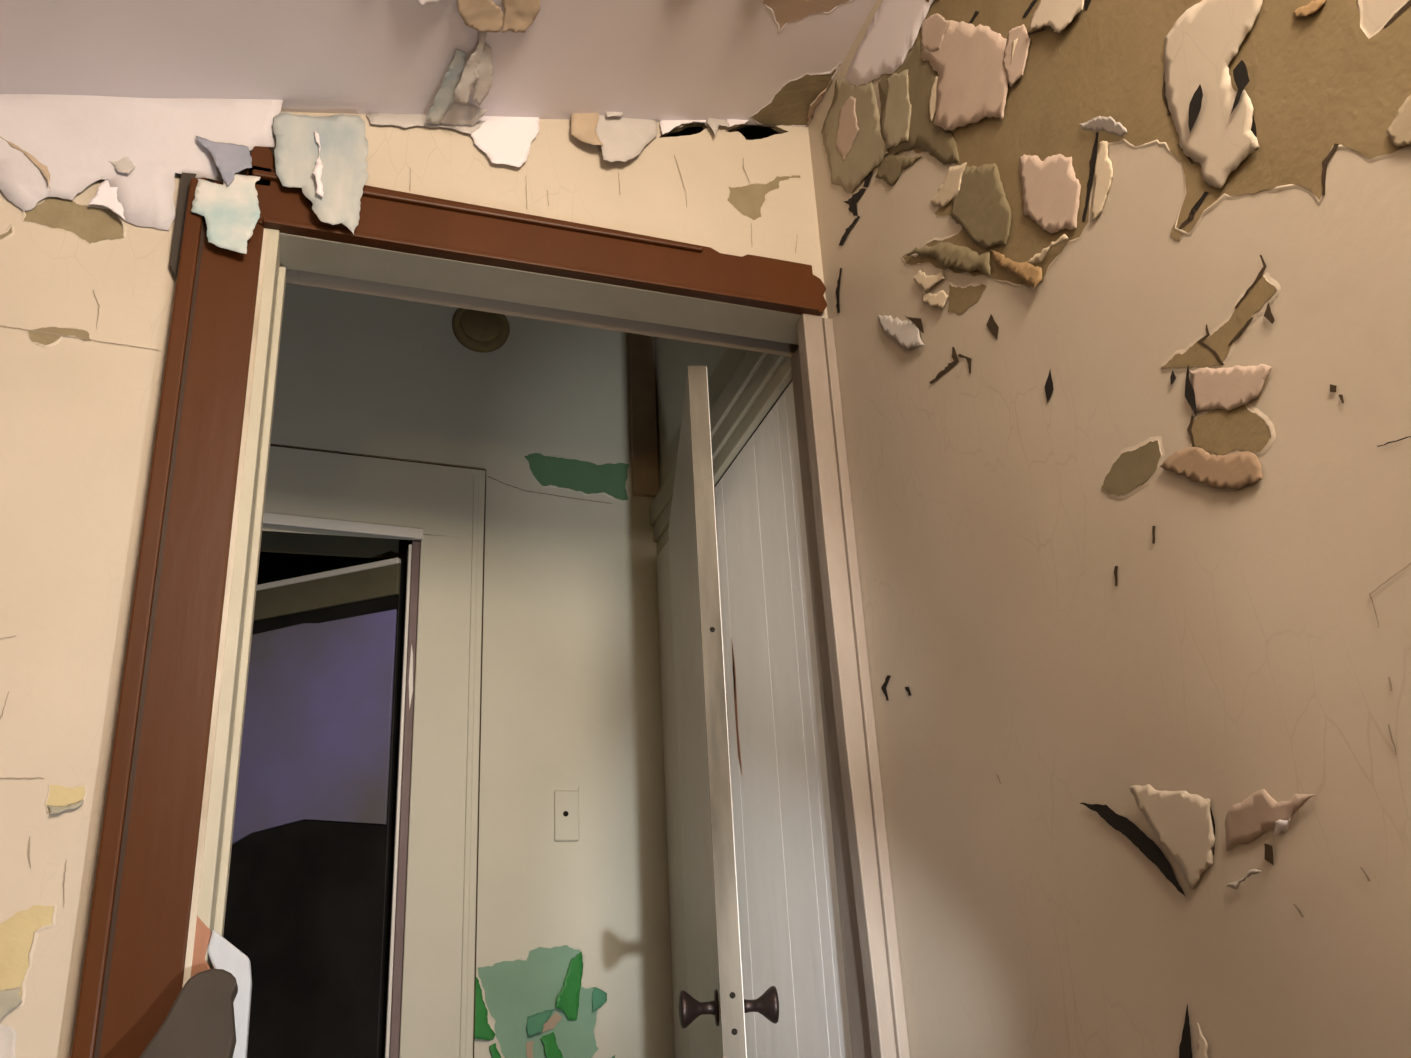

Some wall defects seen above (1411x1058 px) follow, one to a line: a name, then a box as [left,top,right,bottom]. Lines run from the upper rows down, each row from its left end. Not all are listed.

peeling [571,0,1411,349]
peeling [1100,255,1281,501]
crack [1330,384,1344,403]
peeling [0,0,541,988]
peeling [523,452,631,502]
crack [1369,563,1411,627]
peeling [1079,784,1317,897]
peeling [0,903,57,1058]
peeling [475,943,615,1058]